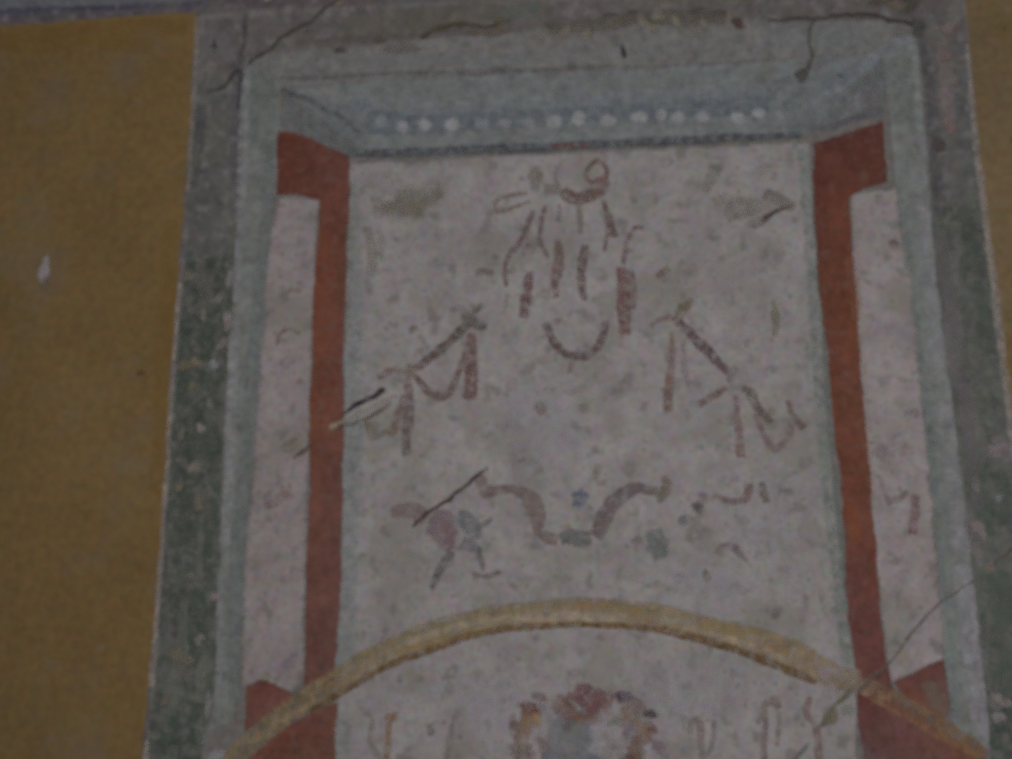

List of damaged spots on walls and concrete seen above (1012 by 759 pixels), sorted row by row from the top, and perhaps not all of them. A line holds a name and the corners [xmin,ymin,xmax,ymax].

crack [205,0,365,111]
crack [794,19,816,83]
crack [793,549,1012,759]